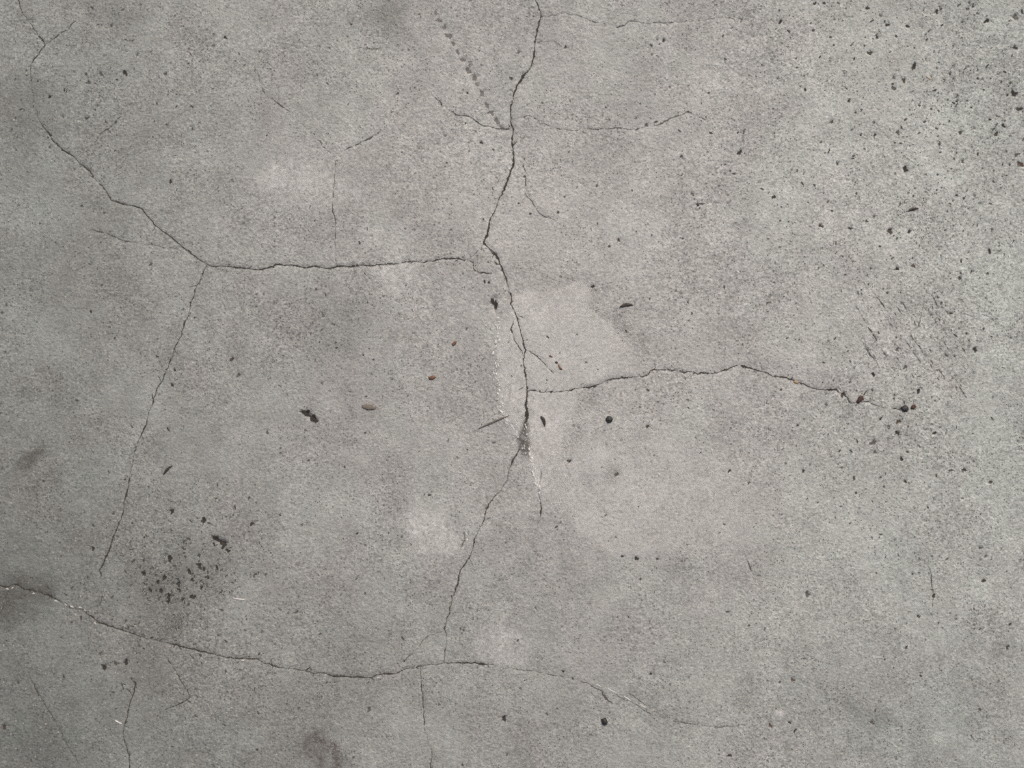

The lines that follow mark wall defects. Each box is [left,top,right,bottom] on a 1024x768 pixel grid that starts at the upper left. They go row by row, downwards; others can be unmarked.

crack [18,0,75,84]
crack [36,109,492,577]
crack [421,3,901,643]
crack [123,678,137,768]
crack [0,584,494,738]